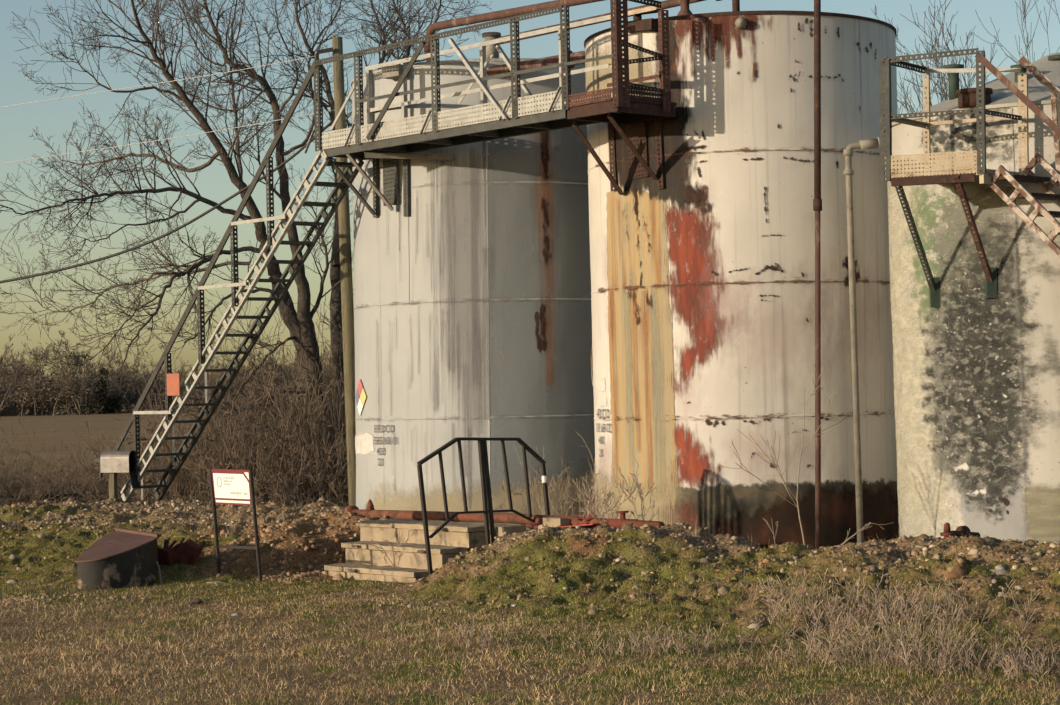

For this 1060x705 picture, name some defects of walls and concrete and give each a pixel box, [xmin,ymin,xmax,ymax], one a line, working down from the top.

leakage [683,182,713,215]
corrosion [526,131,552,383]
corrosion [598,205,890,391]
peeling [711,263,784,276]
leakage [921,188,1060,541]
corrosion [672,416,721,487]
corrosion [711,486,899,548]